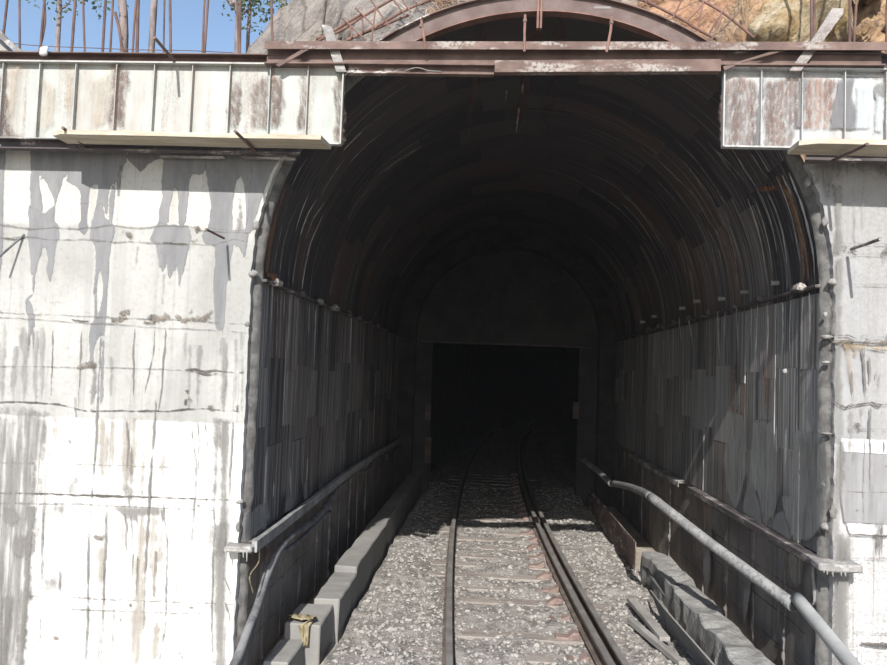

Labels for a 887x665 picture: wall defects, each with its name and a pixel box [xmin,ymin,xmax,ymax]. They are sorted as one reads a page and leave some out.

corrosion [0,71,18,137]
corrosion [108,67,129,127]
corrosion [226,76,284,128]
corrosion [333,80,344,141]
corrosion [720,75,836,146]
water stain [814,164,853,334]
water stain [861,349,880,392]
water stain [0,151,278,665]
crack [833,400,887,409]